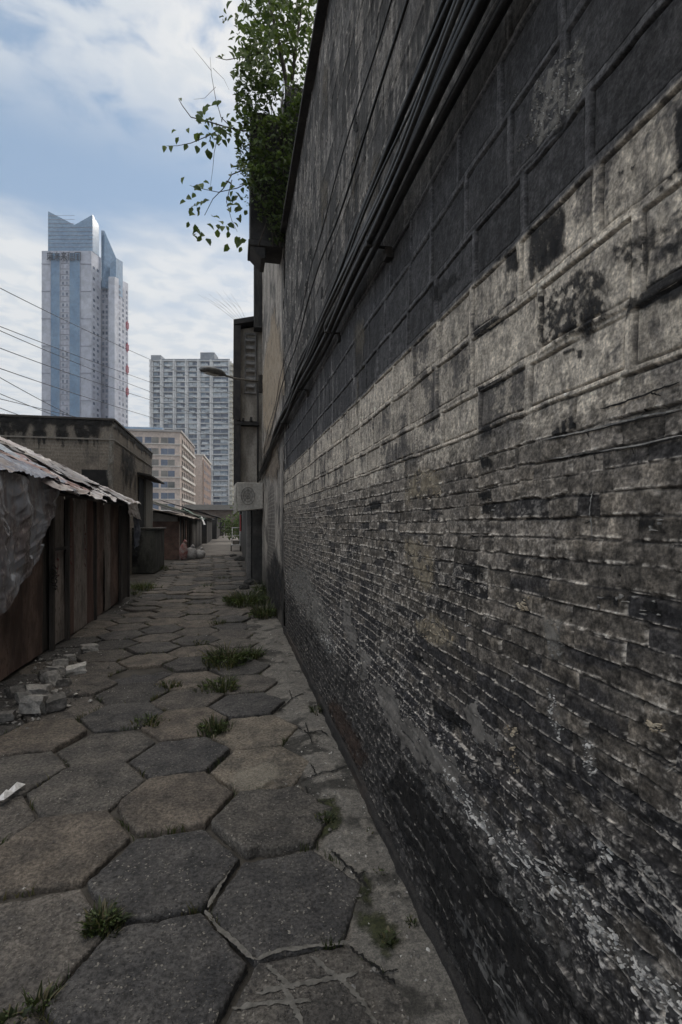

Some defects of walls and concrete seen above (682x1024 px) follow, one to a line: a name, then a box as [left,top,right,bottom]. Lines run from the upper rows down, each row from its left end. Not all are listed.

peeling [531,42,584,143]
leakage [547,688,565,741]
leakage [582,740,598,776]
crack [204,865,395,1024]
crack [332,851,368,889]
leakage [355,870,399,959]
leakage [381,756,682,1024]